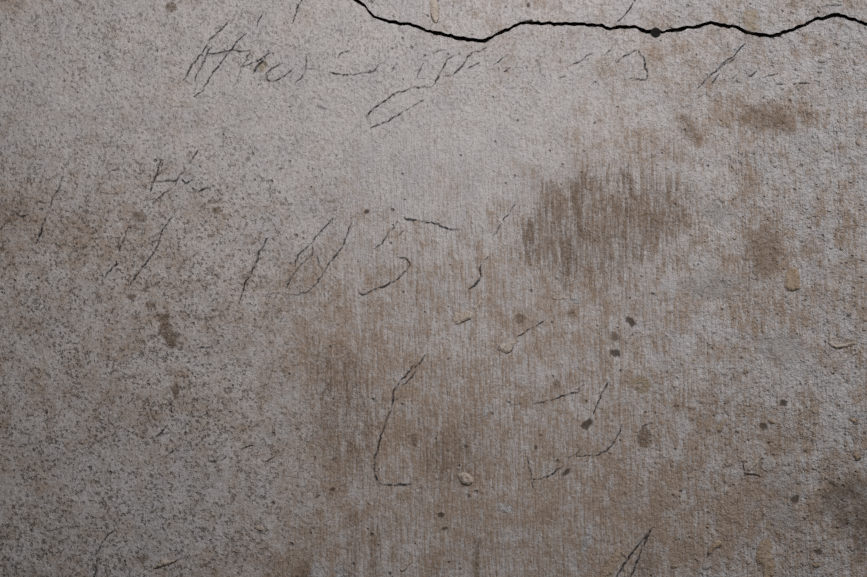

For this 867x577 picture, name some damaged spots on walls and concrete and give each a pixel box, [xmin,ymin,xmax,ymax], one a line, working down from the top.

crack [353,0,867,43]